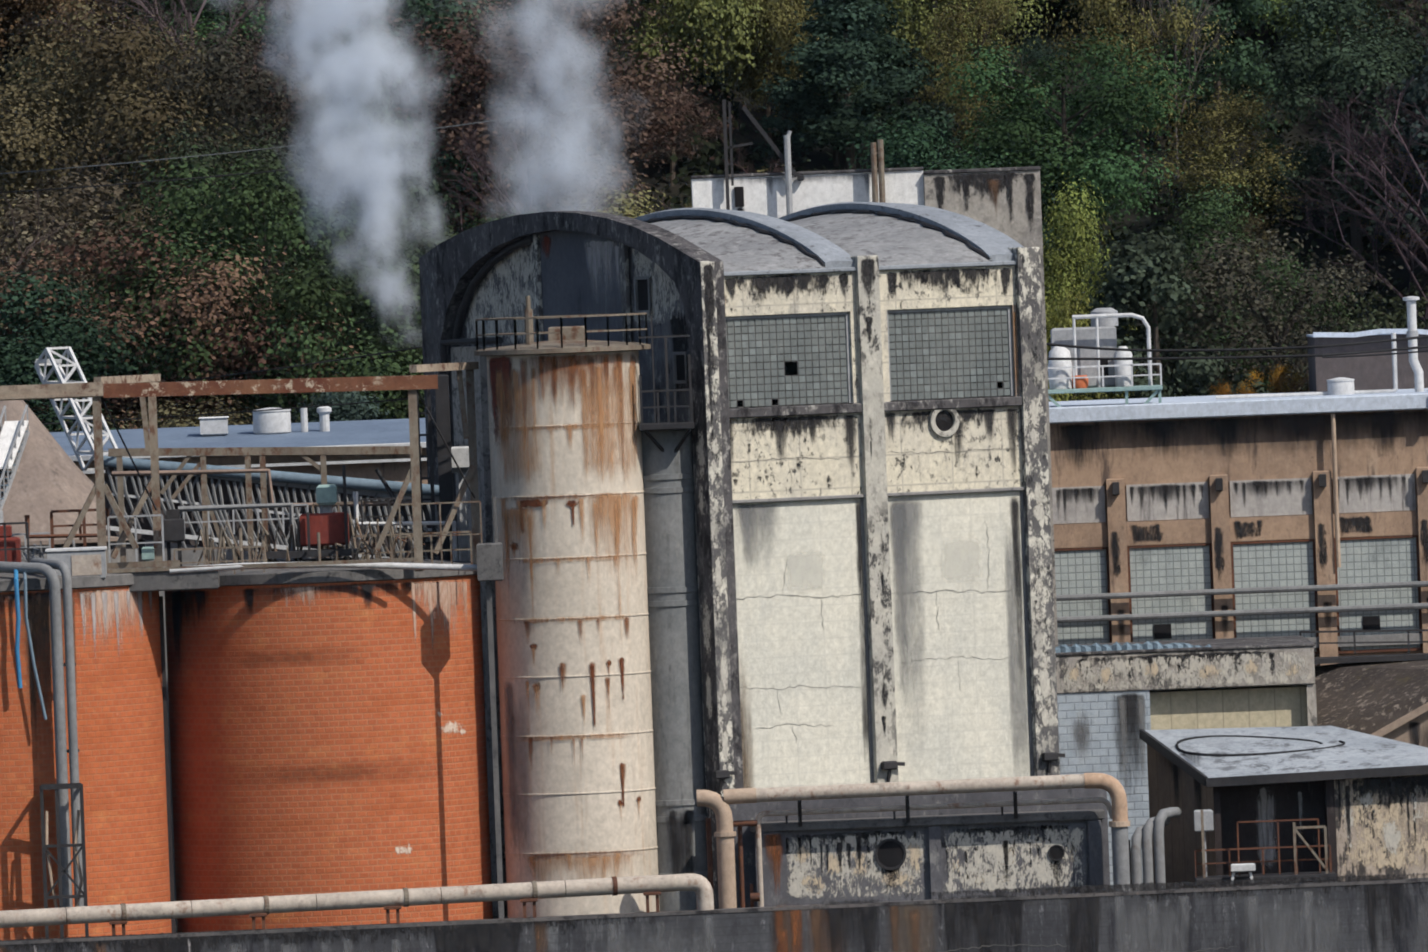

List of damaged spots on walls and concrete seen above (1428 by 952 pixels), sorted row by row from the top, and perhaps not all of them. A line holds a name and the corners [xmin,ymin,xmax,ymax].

damp [934,172,1035,231]
rust [489,354,636,474]
damp [1118,411,1428,449]
rust [501,493,638,589]
damp [0,590,152,714]
rust [526,657,624,759]
peeling [1039,651,1309,727]
rust [618,763,641,810]
peeling [785,833,926,900]
peeling [944,827,1085,894]
flaking render [1341,786,1428,869]
damp [0,917,681,952]